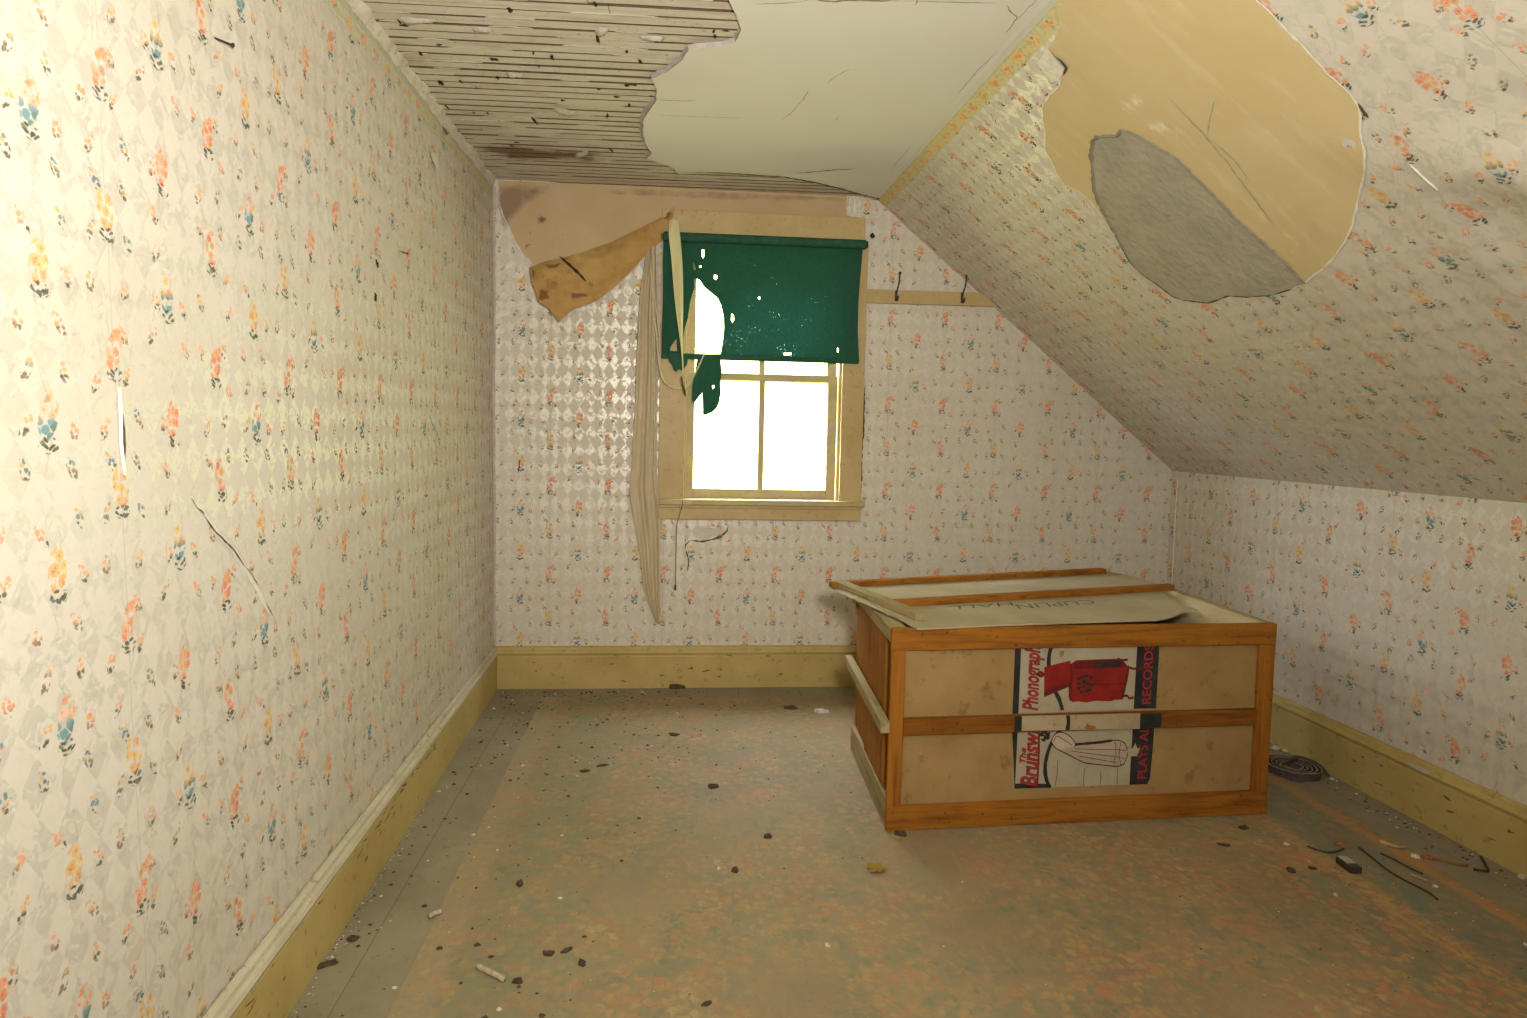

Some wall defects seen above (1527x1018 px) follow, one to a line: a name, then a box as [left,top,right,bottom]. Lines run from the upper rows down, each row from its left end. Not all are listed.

flaking render [345,0,875,397]
crack [765,0,1037,92]
peeling [1037,0,1369,304]
crack [191,498,274,618]